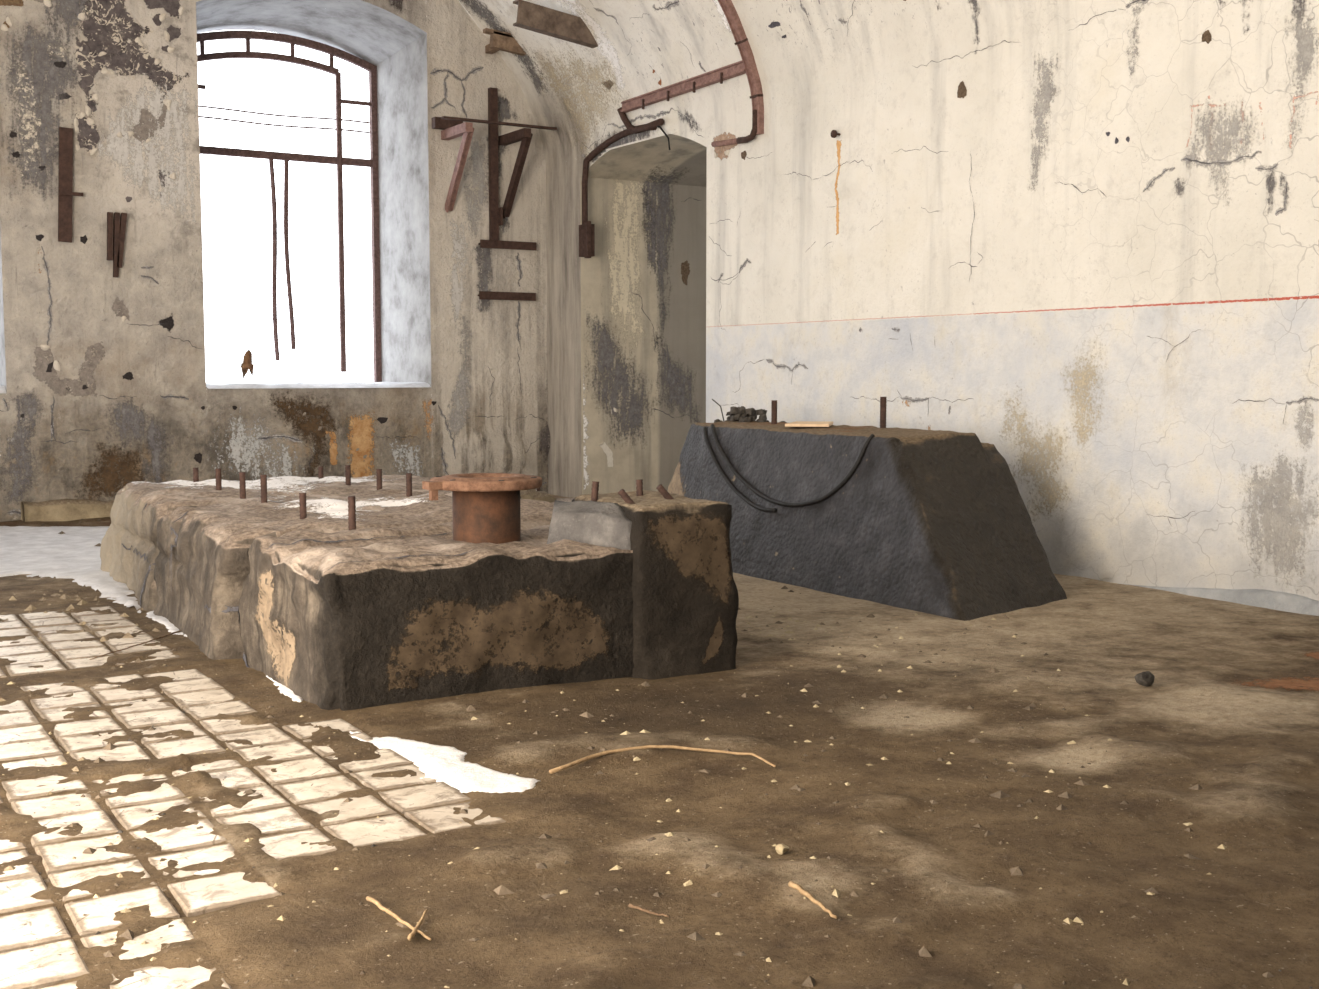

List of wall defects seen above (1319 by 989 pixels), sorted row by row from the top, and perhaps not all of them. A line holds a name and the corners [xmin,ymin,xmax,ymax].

peeling [0,0,52,31]
crack [1068,0,1149,31]
peeling [10,61,45,177]
peeling [47,0,199,224]
crack [430,66,483,117]
water stain [541,0,650,161]
crack [1143,151,1315,220]
water stain [583,167,698,490]
water stain [76,400,173,499]
corrosion [325,410,375,478]
crack [1234,396,1319,422]
water stain [1242,455,1319,591]